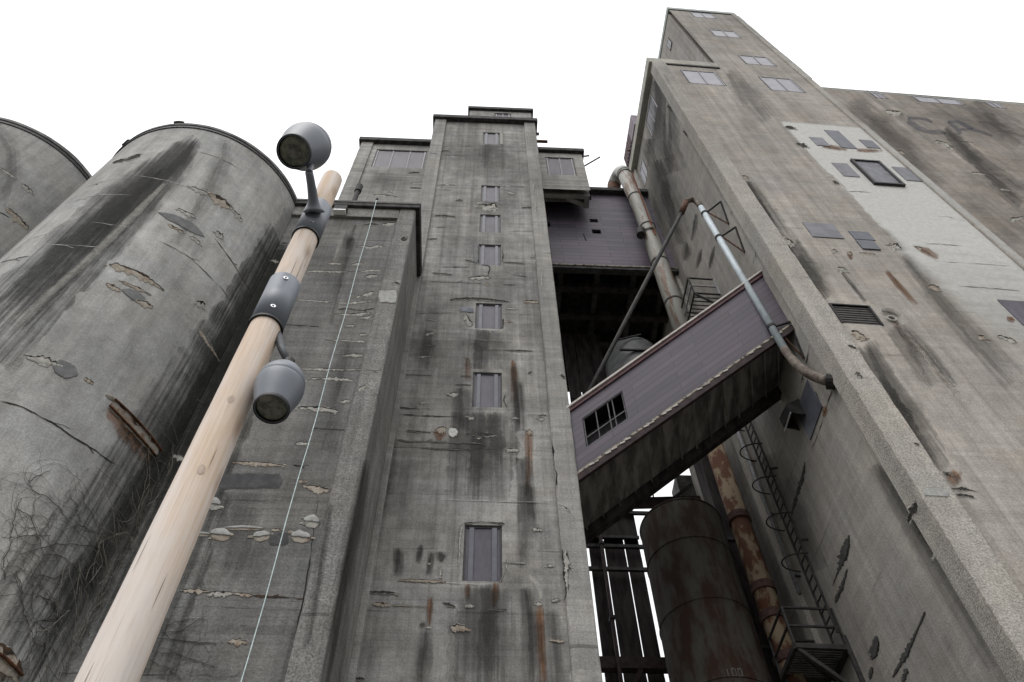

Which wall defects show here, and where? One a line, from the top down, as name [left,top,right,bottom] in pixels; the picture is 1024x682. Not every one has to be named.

damp [0,142,195,321]
spalling [187,185,243,222]
spalling [105,262,164,309]
crack [3,401,115,464]
spalling [199,514,320,543]
peeling [832,535,850,602]
peeling [892,612,925,682]